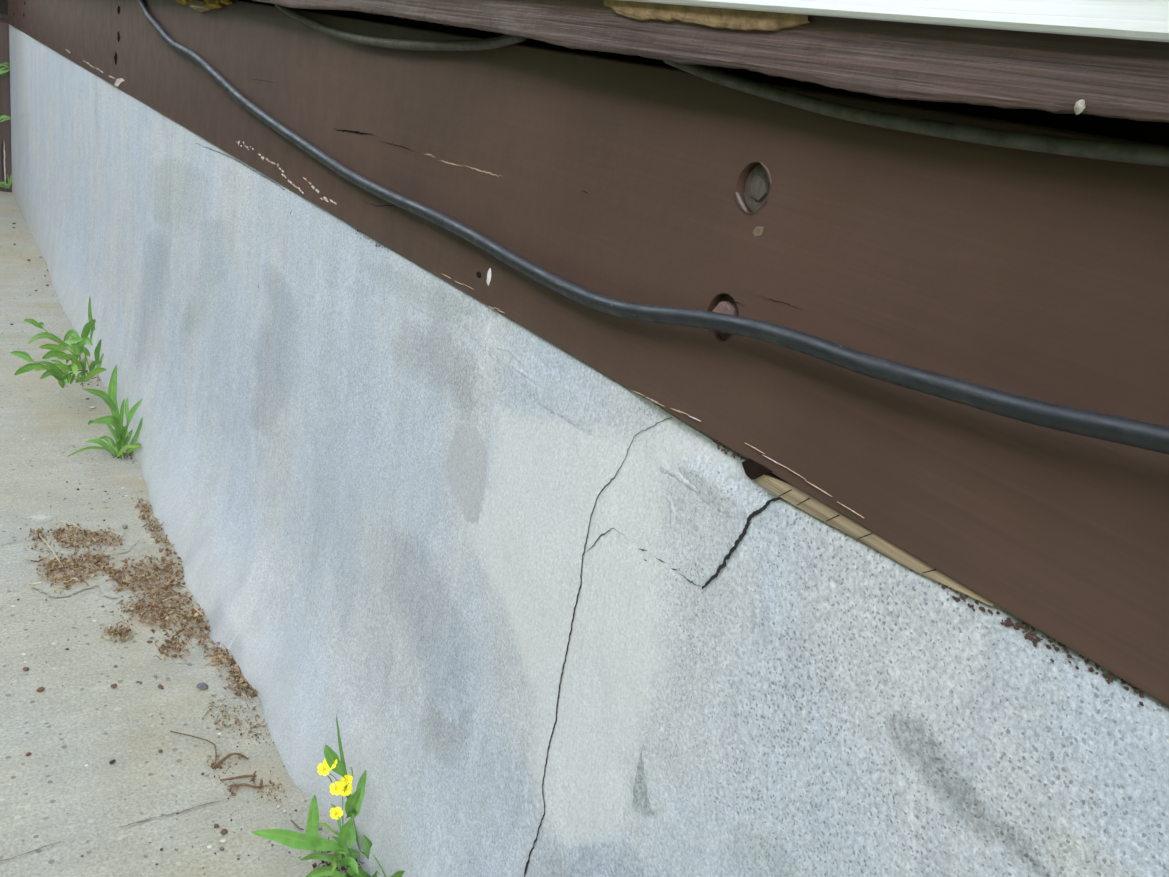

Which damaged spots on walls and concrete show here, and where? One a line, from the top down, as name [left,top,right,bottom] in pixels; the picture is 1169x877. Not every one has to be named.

spalling [84,31,124,87]
peeling [238,141,337,205]
spalling [742,443,864,518]
crack [524,417,782,877]